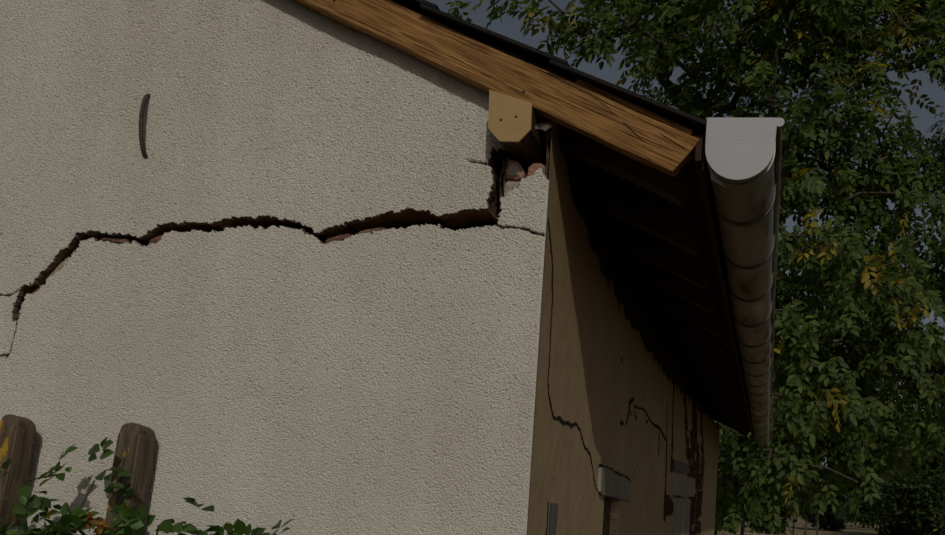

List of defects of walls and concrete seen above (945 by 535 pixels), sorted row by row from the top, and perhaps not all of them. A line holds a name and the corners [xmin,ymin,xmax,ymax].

crack [0,150,598,491]
crack [620,397,668,456]
flaking render [663,492,674,522]